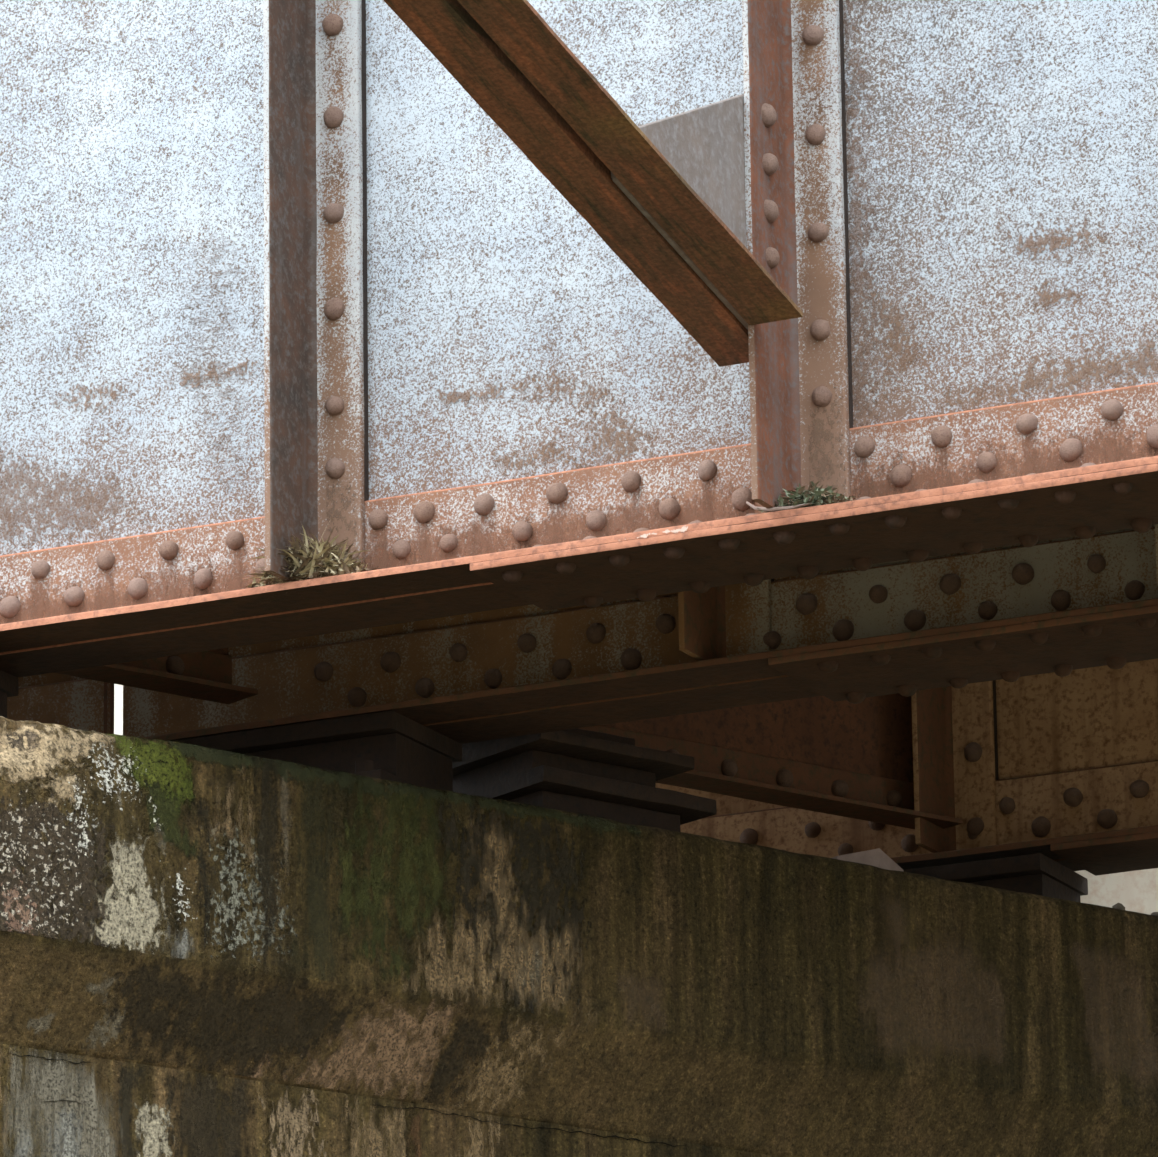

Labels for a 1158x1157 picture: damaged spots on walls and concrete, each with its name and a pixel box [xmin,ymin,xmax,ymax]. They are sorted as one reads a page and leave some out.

rust [808,0,1158,503]
rust [44,378,133,416]
rust [167,354,258,388]
rust [434,363,659,480]
rust [0,448,159,554]
rust [326,478,753,571]
rust [0,549,271,624]
leakage [0,756,596,1157]